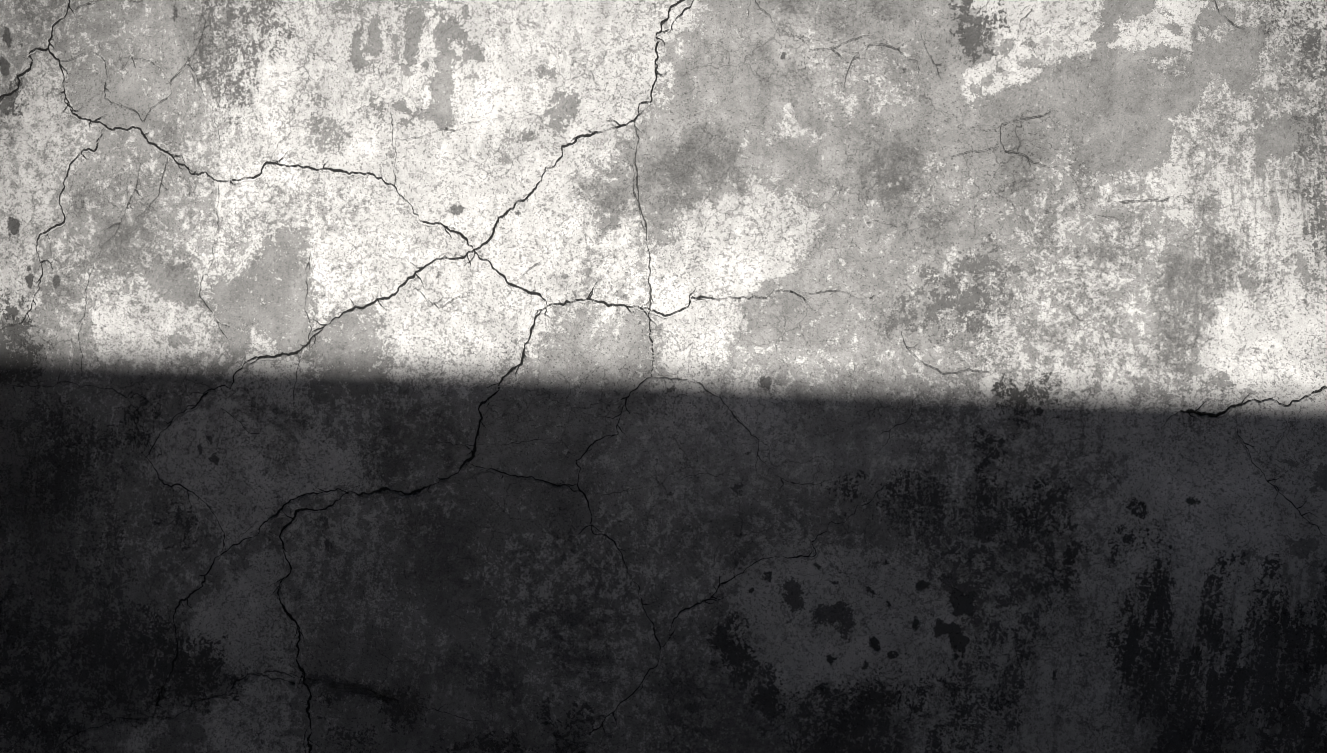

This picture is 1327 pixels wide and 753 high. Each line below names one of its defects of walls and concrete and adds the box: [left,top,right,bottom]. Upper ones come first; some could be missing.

crack [0,0,993,753]
crack [1161,386,1327,536]